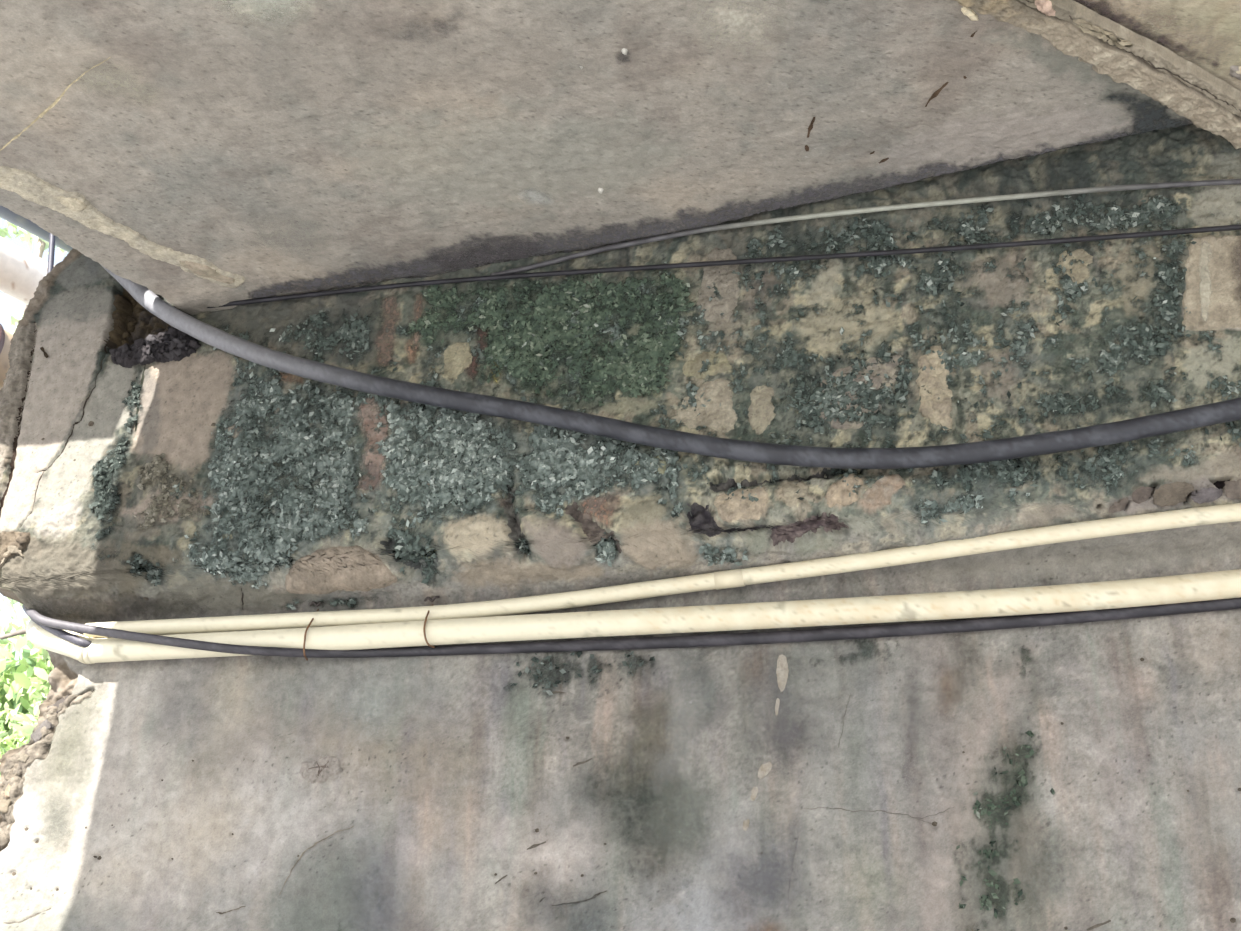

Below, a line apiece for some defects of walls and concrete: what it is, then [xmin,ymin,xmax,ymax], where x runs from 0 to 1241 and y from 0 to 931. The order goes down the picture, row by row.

spalling [961,7,979,21]
spalling [1035,0,1056,16]
damp [1200,243,1211,321]
crack [0,322,107,527]
spalling [0,531,31,569]
spalling [0,690,93,851]
damp [592,663,715,846]